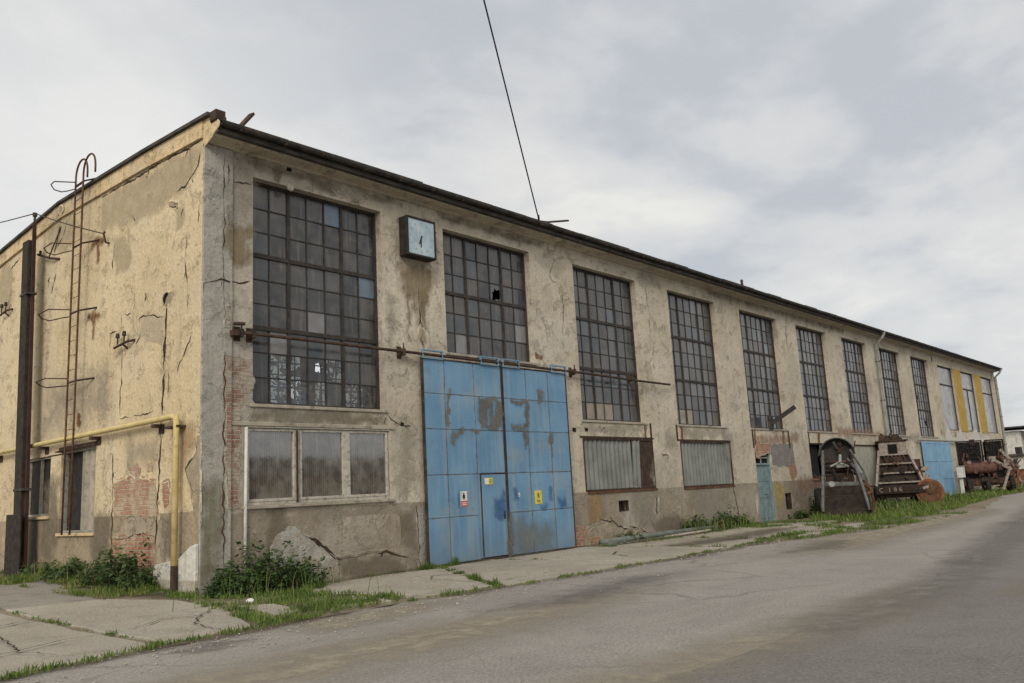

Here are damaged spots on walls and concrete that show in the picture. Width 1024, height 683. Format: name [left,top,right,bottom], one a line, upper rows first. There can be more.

crack [103,140,249,564]
flaking render [223,354,255,510]
corrosion [445,389,543,449]
flaking render [755,441,797,482]
flaking render [111,462,171,571]
crack [294,505,459,579]
crack [602,495,658,556]